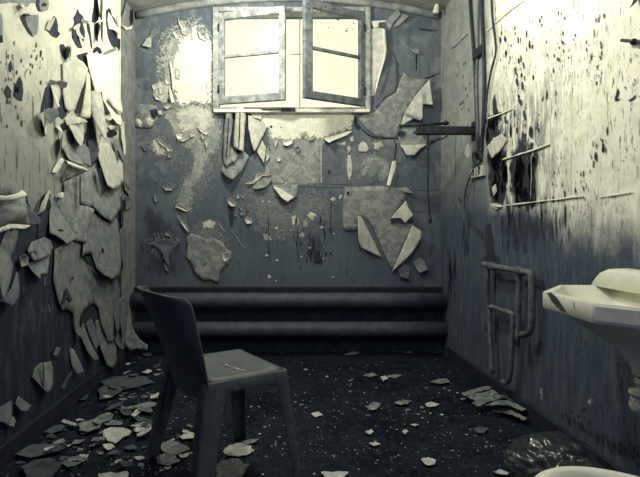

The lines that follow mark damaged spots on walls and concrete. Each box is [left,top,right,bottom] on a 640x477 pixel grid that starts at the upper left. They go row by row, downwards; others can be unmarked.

flaking render [135,9,441,282]
flaking render [487,134,507,158]
damp [485,31,569,254]
mould [580,128,608,177]
peeling [0,0,133,368]
damp [482,223,500,269]
peeling [0,396,31,427]
peeling [32,347,61,393]
peeling [61,348,84,390]
peeling [98,383,122,400]